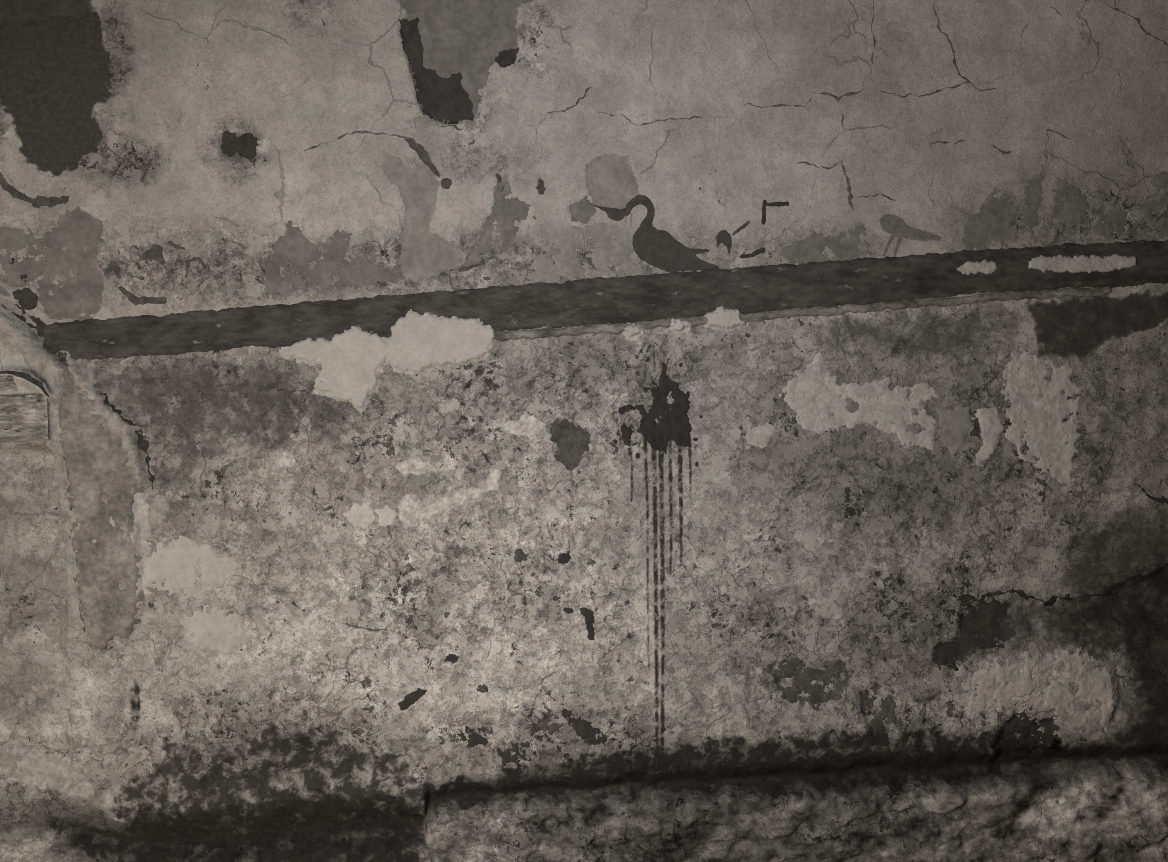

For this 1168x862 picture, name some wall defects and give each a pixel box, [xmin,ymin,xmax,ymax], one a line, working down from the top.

crack [1085,0,1168,46]
spalling [399,0,533,126]
crack [745,0,996,129]
crack [548,87,703,125]
crack [304,125,462,155]
crack [798,161,895,210]
peeling [279,309,497,413]
crack [1133,483,1168,505]
crack [959,562,1168,607]
water stain [0,520,1168,862]